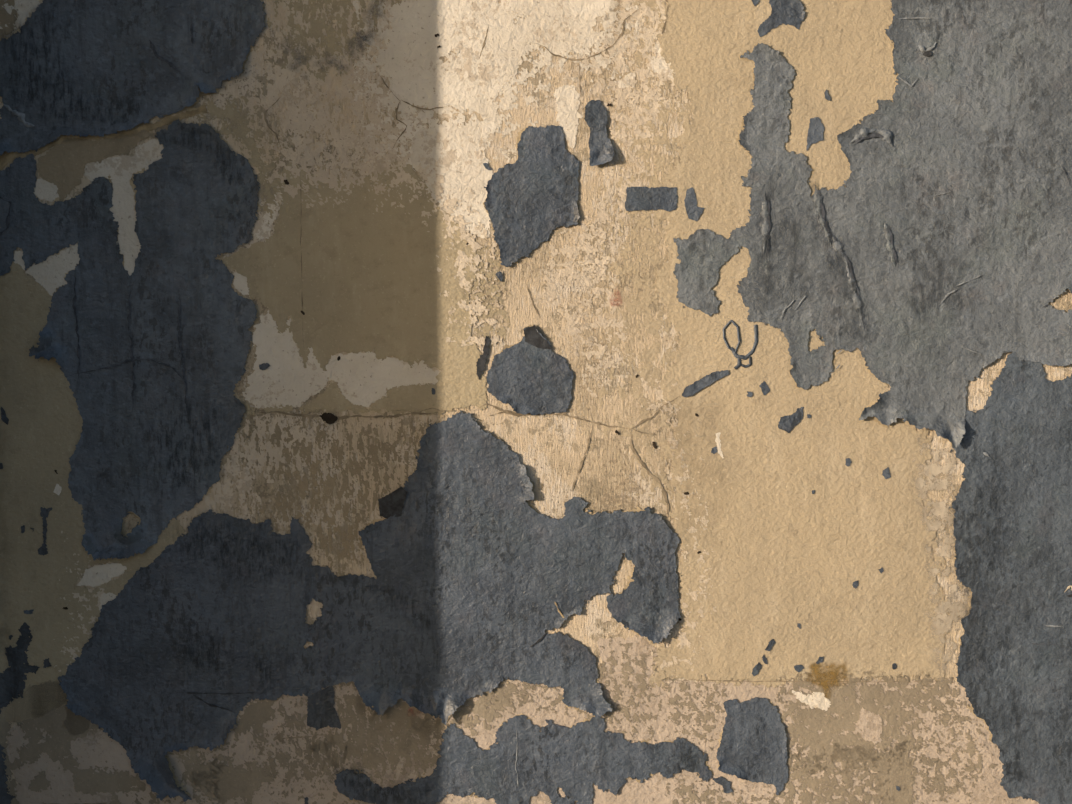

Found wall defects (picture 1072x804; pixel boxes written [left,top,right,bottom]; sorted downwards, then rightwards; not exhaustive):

peeling [0,0,267,170]
crack [379,74,447,149]
crack [530,10,637,93]
peeling [356,415,407,511]
crack [247,396,679,518]